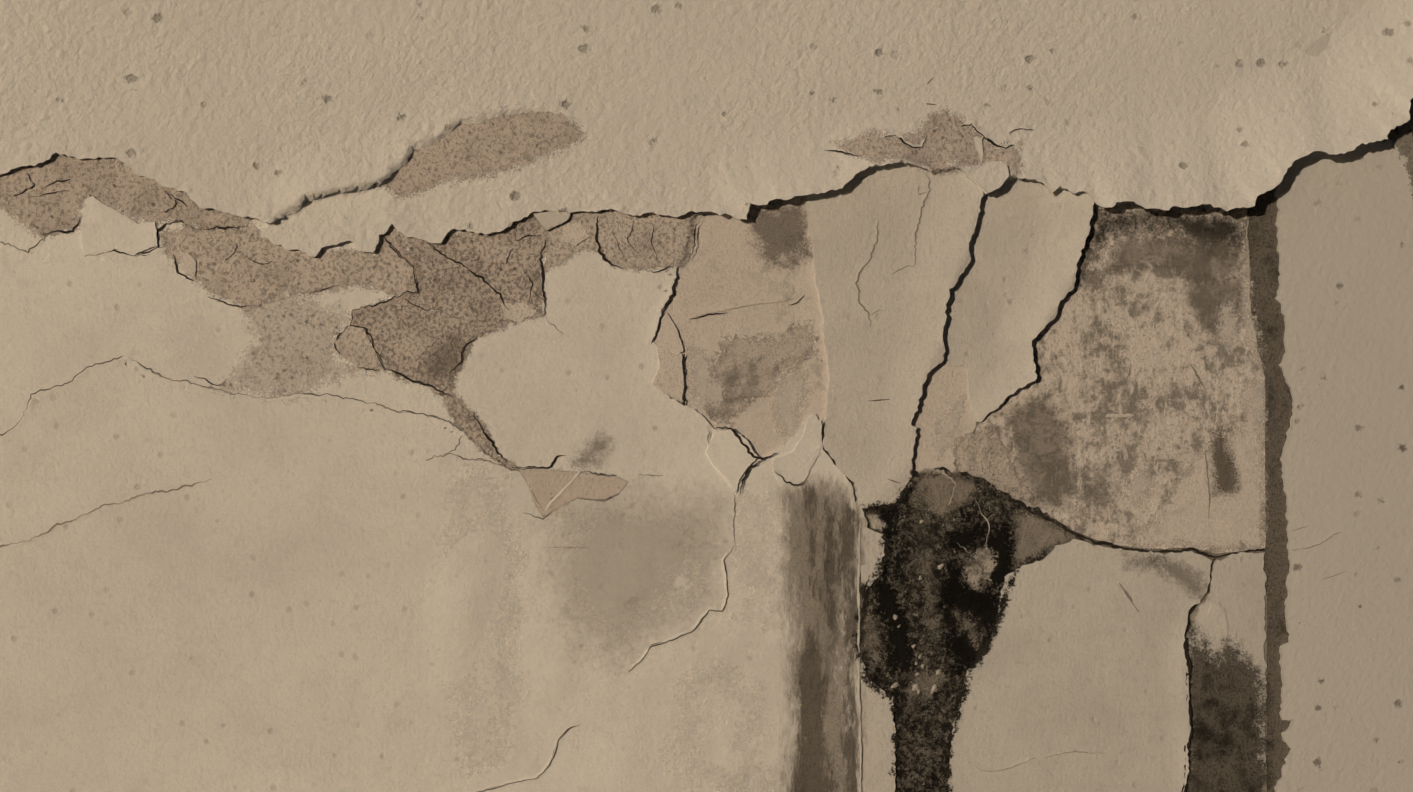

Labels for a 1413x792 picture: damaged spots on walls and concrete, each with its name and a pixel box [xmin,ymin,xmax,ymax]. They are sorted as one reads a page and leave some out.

crack [0,232,663,552]
crack [471,726,576,792]
crack [595,212,702,406]
peeling [0,0,1413,608]
crack [629,426,806,672]
water stain [667,467,1086,792]
peeling [859,628,896,792]
peeling [948,539,1274,792]
crack [998,490,1346,792]
water stain [1205,426,1239,519]